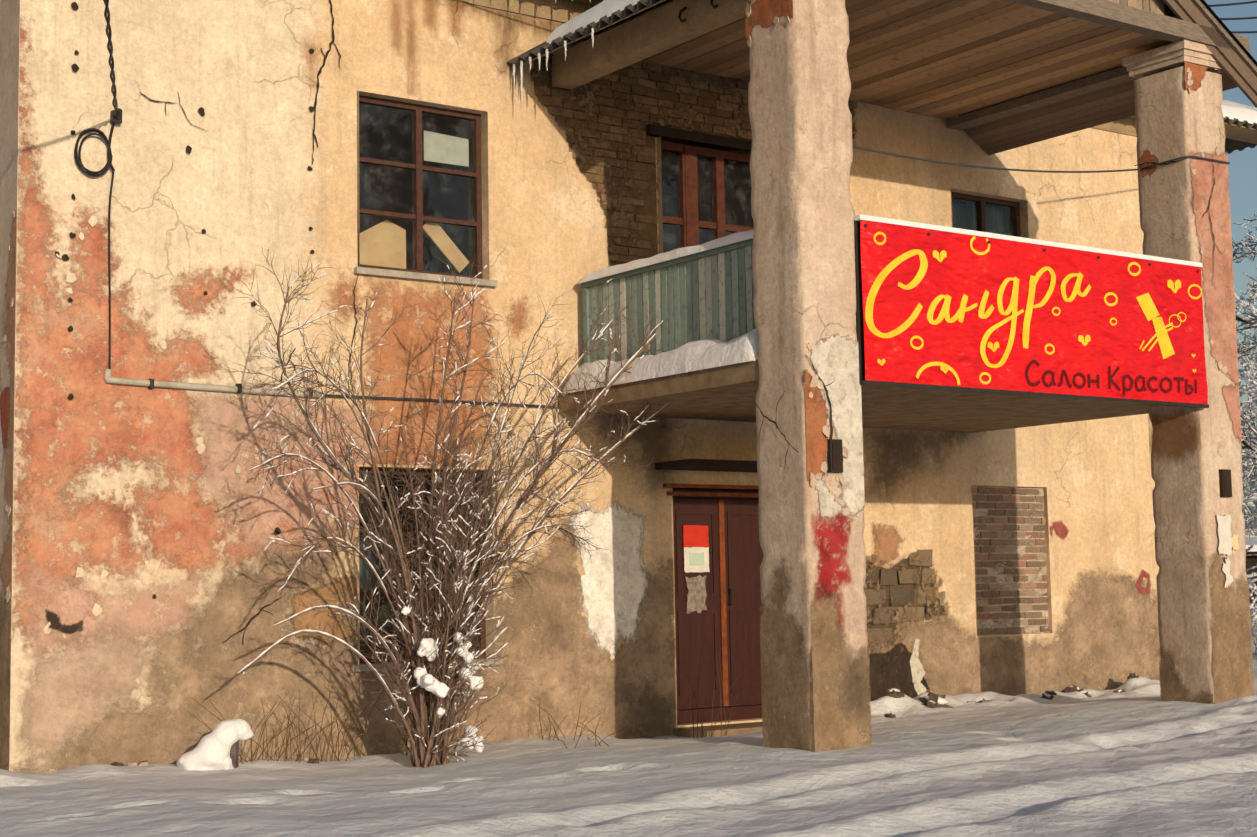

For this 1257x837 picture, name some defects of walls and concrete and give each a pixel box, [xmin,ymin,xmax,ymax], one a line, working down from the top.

crack [139,91,204,130]
crack [312,0,341,164]
flaking render [530,54,752,266]
flaking render [745,0,793,47]
flaking render [848,101,857,139]
flaking render [1184,61,1223,94]
peeling [512,305,526,335]
peeling [1189,146,1242,442]
peeling [0,67,494,771]
peeling [804,333,865,521]
flaking render [864,524,950,701]
water stain [760,552,1255,752]